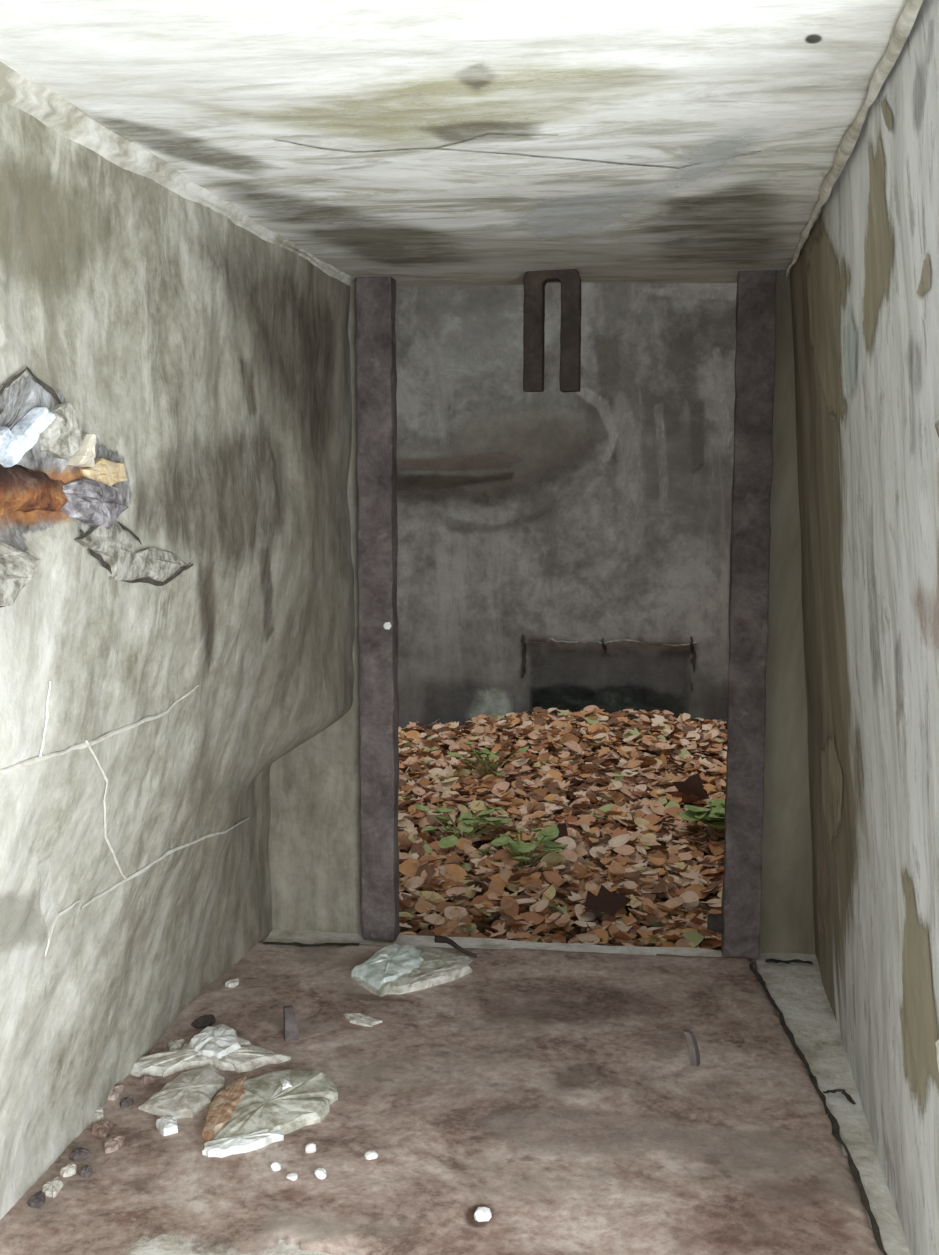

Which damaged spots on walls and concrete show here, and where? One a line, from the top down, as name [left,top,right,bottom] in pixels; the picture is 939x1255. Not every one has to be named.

water stain [259,70,606,142]
water stain [103,121,257,170]
water stain [242,187,443,264]
water stain [658,187,773,261]
peeling [862,98,894,354]
peeling [917,254,931,298]
water stain [218,265,332,443]
corrosion [0,464,68,516]
spalling [0,366,193,608]
peeling [899,870,939,1112]